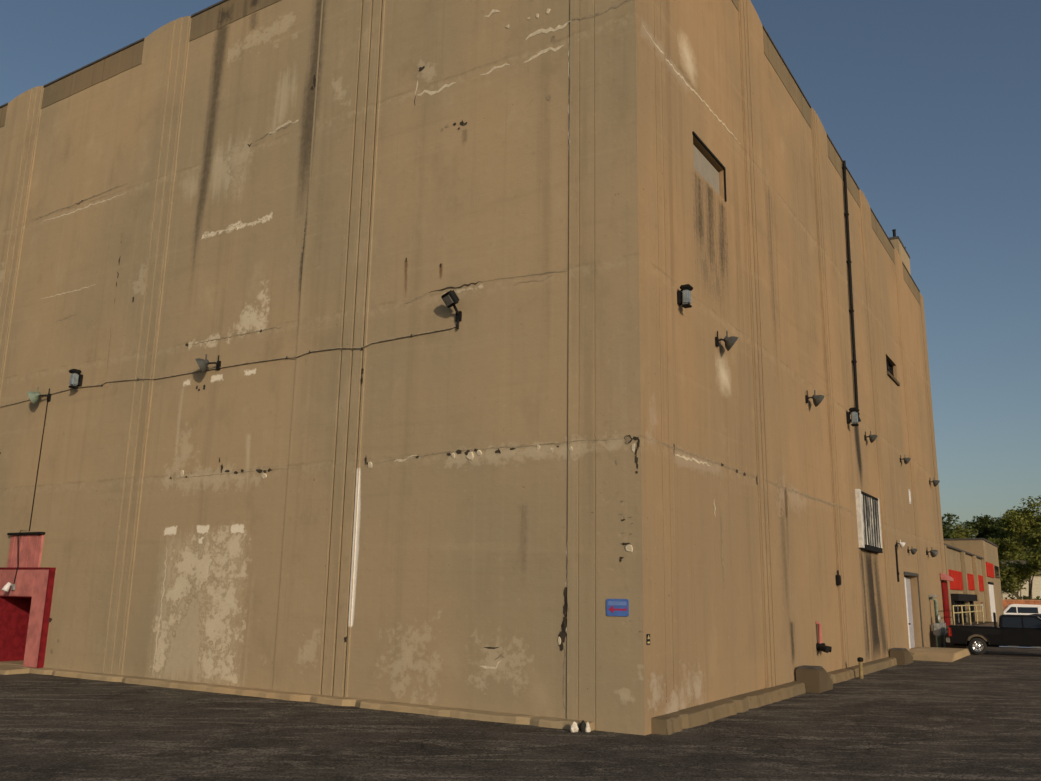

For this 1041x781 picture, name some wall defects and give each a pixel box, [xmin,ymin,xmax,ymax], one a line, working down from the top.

peeling [226,11,298,68]
crack [639,12,736,139]
crack [32,184,125,221]
damp [187,2,235,318]
peeling [188,279,271,351]
damp [294,0,329,326]
crack [404,270,569,304]
damp [691,168,732,317]
peeling [145,519,269,687]
peeling [373,604,447,705]
peeling [464,627,534,698]
crack [558,541,568,708]